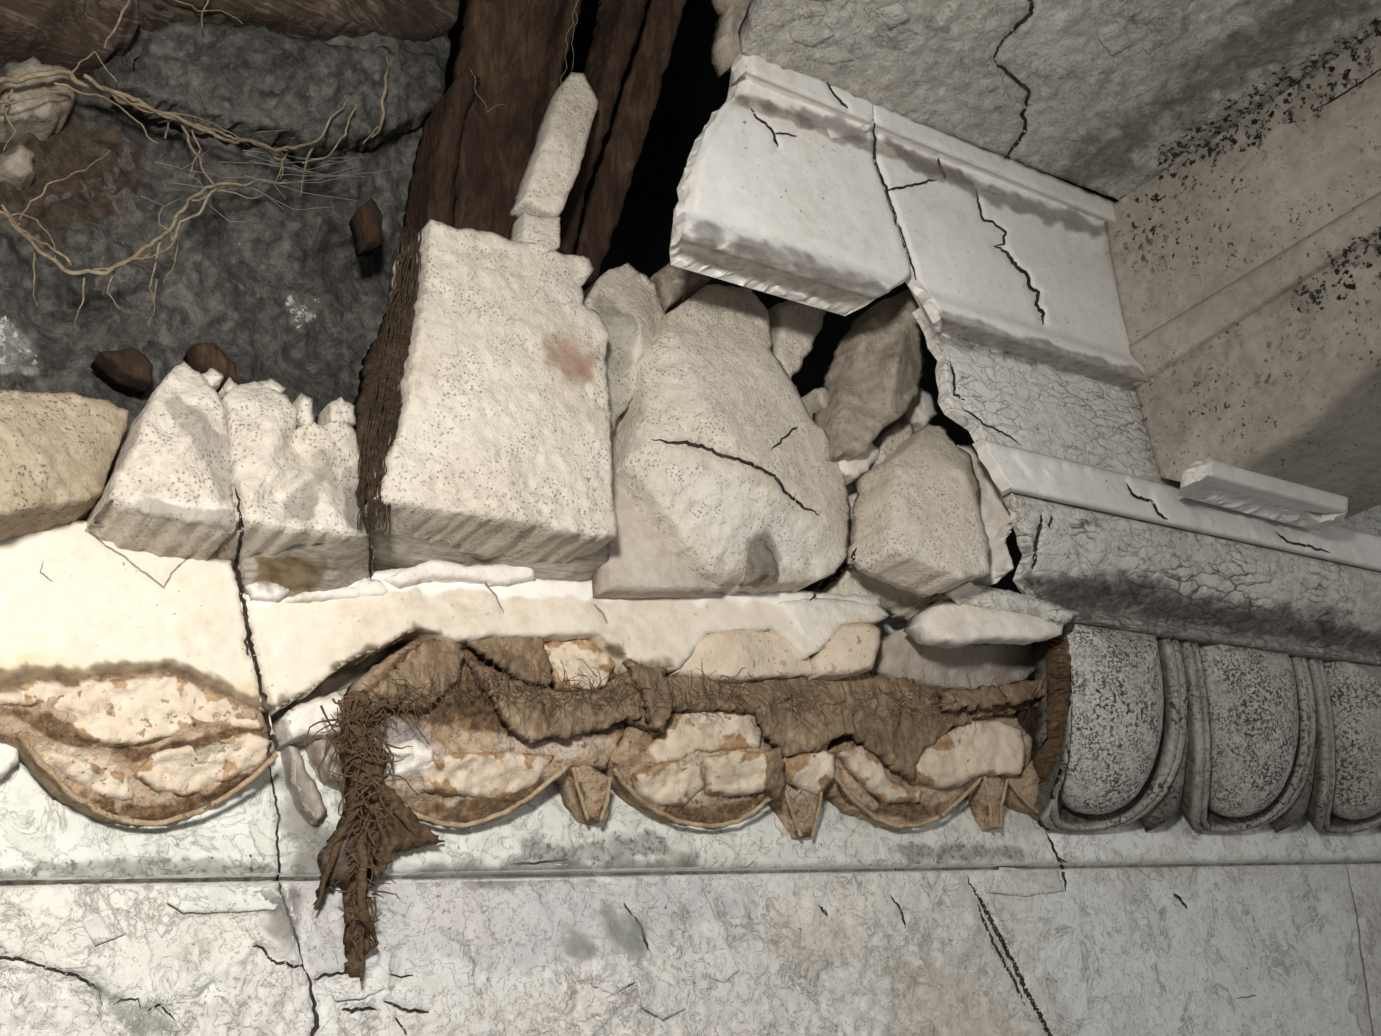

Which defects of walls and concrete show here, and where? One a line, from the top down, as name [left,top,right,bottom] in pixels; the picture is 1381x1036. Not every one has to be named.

crack [751,108,796,146]
crack [827,82,946,280]
crack [976,193,1045,325]
crack [993,0,1034,159]
damp [1145,19,1381,180]
damp [1291,227,1381,313]
crack [651,426,819,515]
peeling [777,598,890,654]
crack [233,488,429,1036]
crack [968,878,1053,1036]
crack [1346,866,1374,1036]